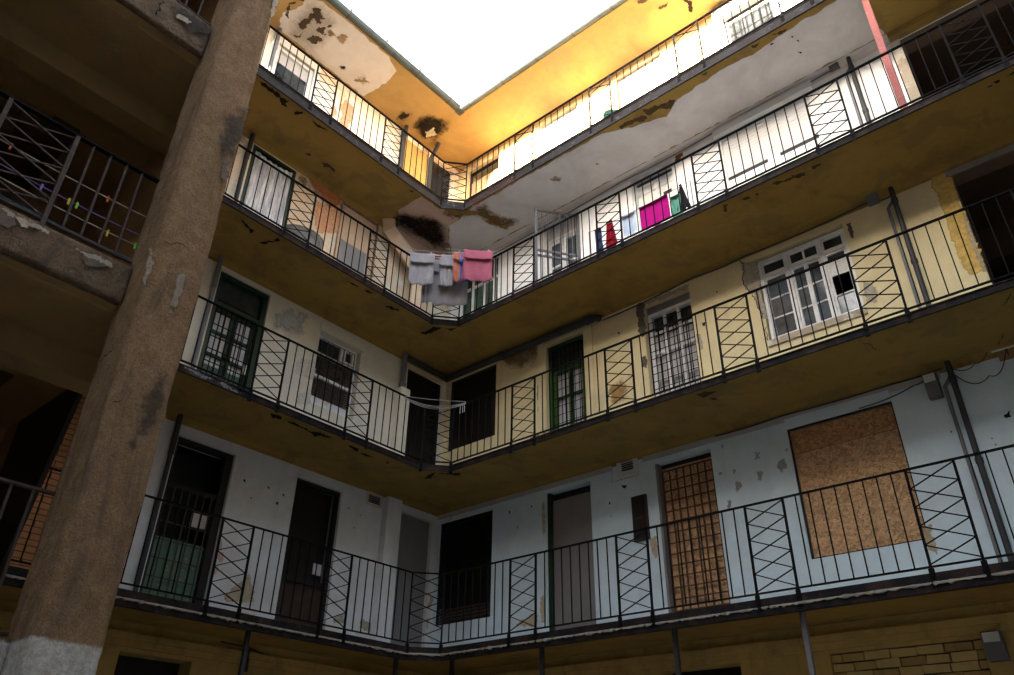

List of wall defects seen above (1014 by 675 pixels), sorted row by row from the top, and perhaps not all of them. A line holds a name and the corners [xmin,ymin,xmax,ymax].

peeling [268,0,332,44]
peeling [619,100,677,129]
peeling [0,207,50,234]
damp [394,214,446,248]
spalling [446,209,507,229]
peeling [931,173,987,275]
peeling [75,248,113,268]
spalling [741,261,768,319]